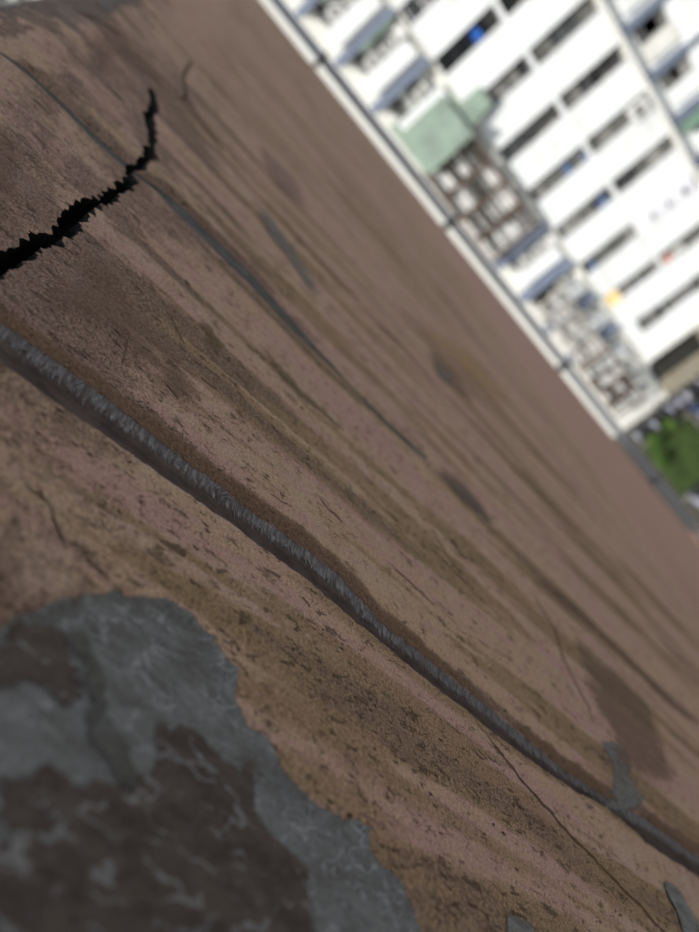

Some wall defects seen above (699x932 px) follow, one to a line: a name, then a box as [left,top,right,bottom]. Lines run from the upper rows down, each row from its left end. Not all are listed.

crack [0,50,194,280]
spalling [0,590,421,932]